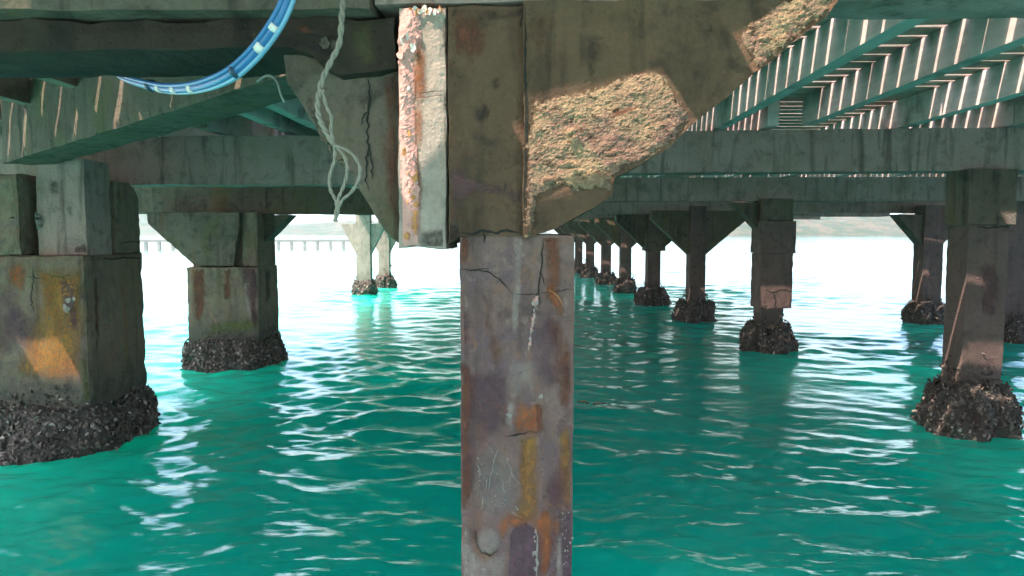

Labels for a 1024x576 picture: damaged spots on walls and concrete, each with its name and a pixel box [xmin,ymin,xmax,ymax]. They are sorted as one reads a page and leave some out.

crack [327,79,374,189]
peeling [396,5,445,247]
crack [461,5,572,318]
spalling [525,72,689,240]
crack [28,266,73,313]
rust [21,271,83,377]
rust [194,269,205,319]
rust [501,405,558,570]